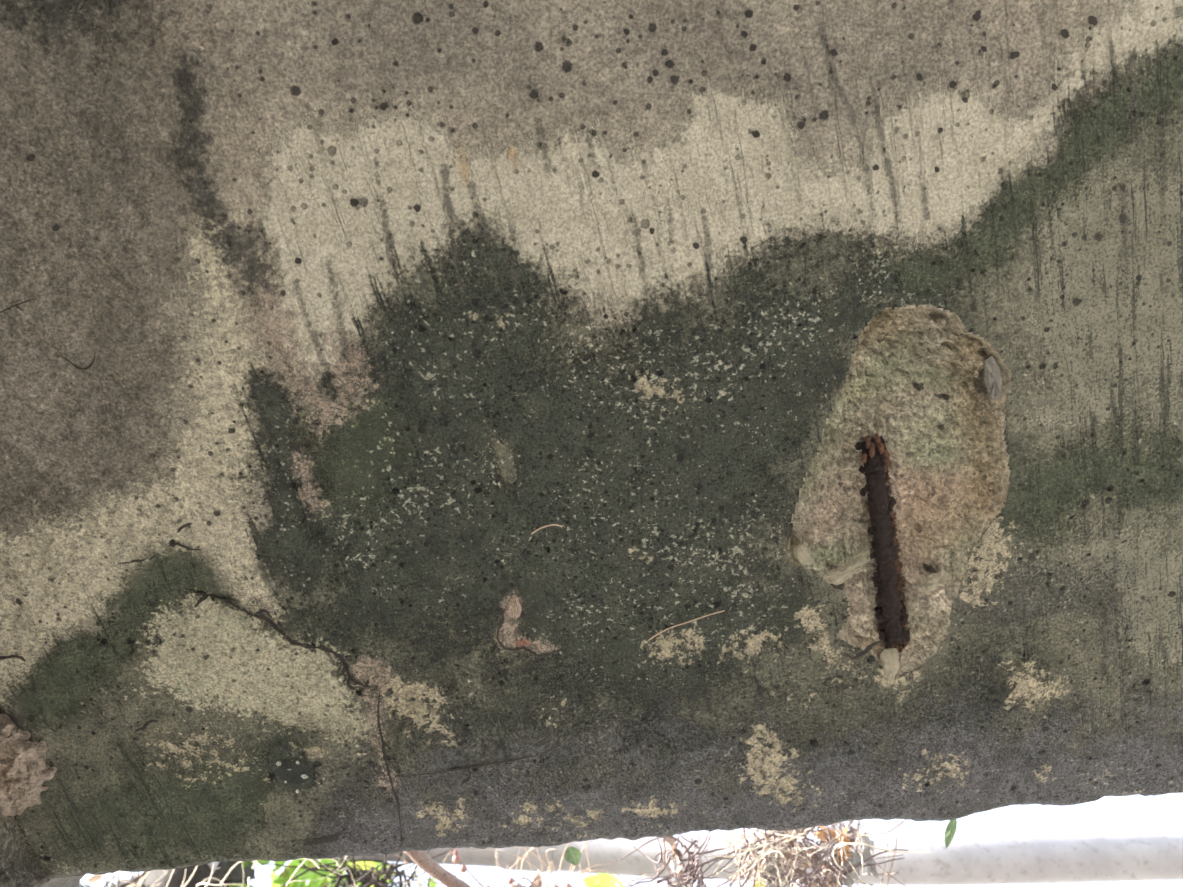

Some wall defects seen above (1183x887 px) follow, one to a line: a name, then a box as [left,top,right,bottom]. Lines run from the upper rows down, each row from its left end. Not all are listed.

water stain [252,0,1183,446]
crack [135,719,158,732]
water stain [0,218,297,713]
crack [118,523,202,564]
crack [191,591,555,846]
spalling [634,304,1020,703]
rust [872,438,910,652]
water stain [1044,500,1183,708]